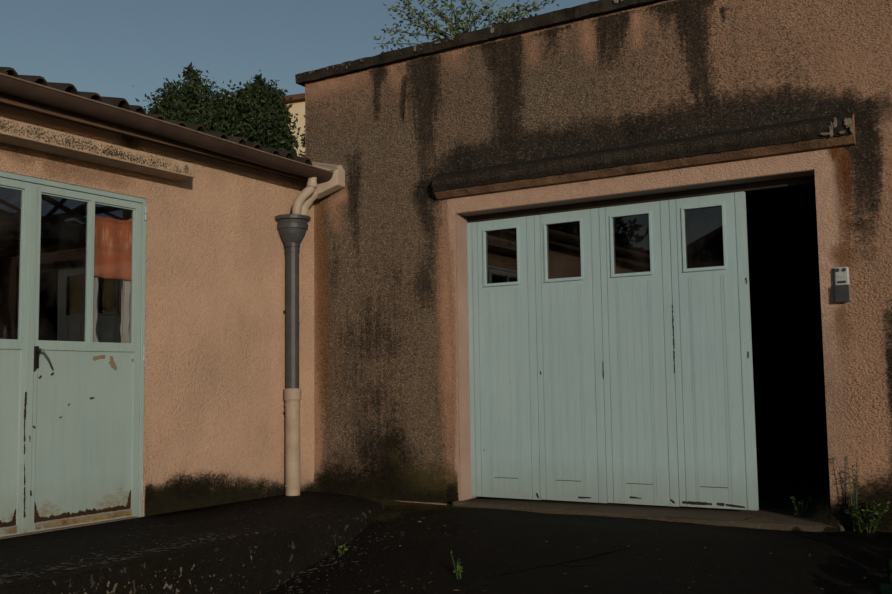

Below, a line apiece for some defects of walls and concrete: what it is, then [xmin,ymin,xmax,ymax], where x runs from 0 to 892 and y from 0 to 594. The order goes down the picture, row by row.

spalling [820,117,853,138]
damp [844,120,883,256]
damp [306,0,730,489]
peeling [93,355,117,370]
peeling [24,392,35,518]
corrosion [0,509,17,534]
corrosion [34,490,132,529]
damp [812,478,892,532]